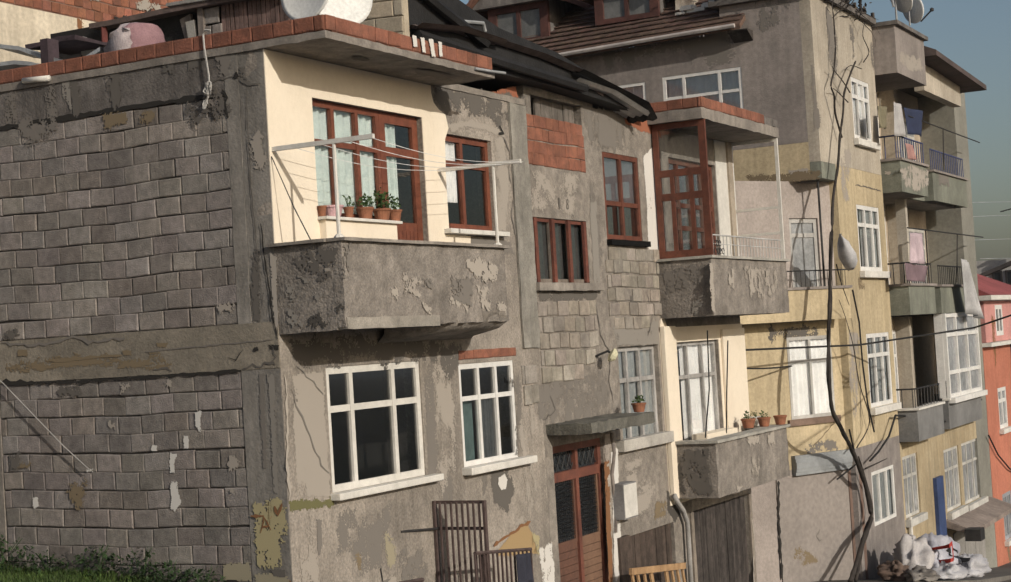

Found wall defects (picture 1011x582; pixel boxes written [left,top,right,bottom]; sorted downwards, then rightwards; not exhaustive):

flaking render [526,113,586,173]
crack [0,72,329,500]
spalling [498,525,555,582]